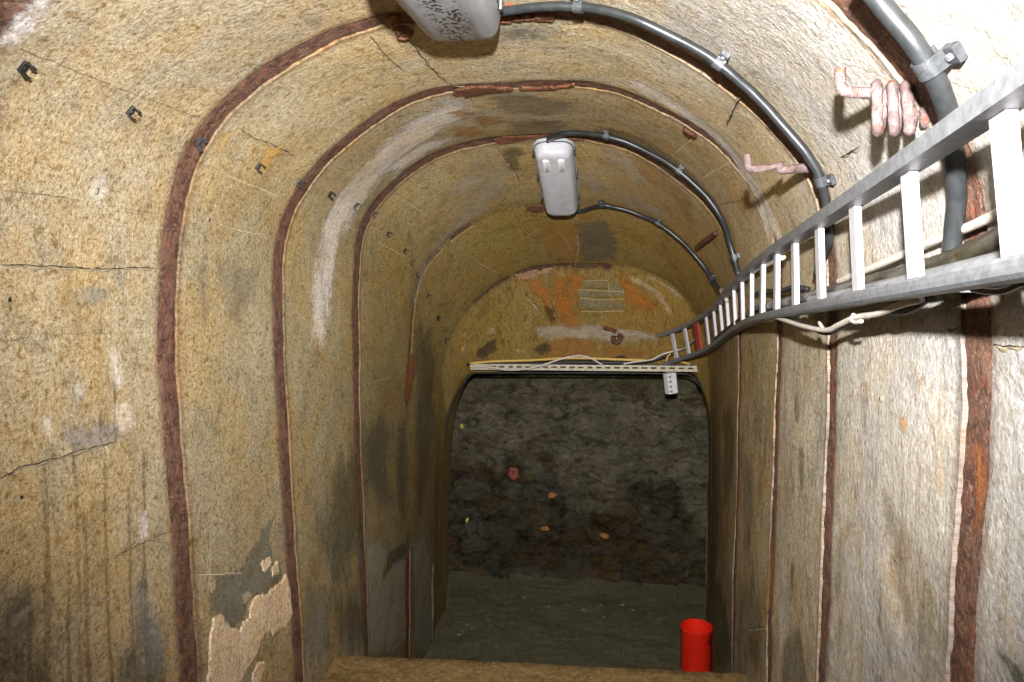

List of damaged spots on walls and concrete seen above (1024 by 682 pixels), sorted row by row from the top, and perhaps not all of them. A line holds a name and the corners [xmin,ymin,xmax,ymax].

crack [17,46,199,117]
crack [369,35,465,88]
crack [240,129,296,157]
efflorescence [311,97,476,346]
crack [1,260,156,273]
corrosion [524,275,644,358]
crack [0,418,118,480]
peeling [200,557,293,682]